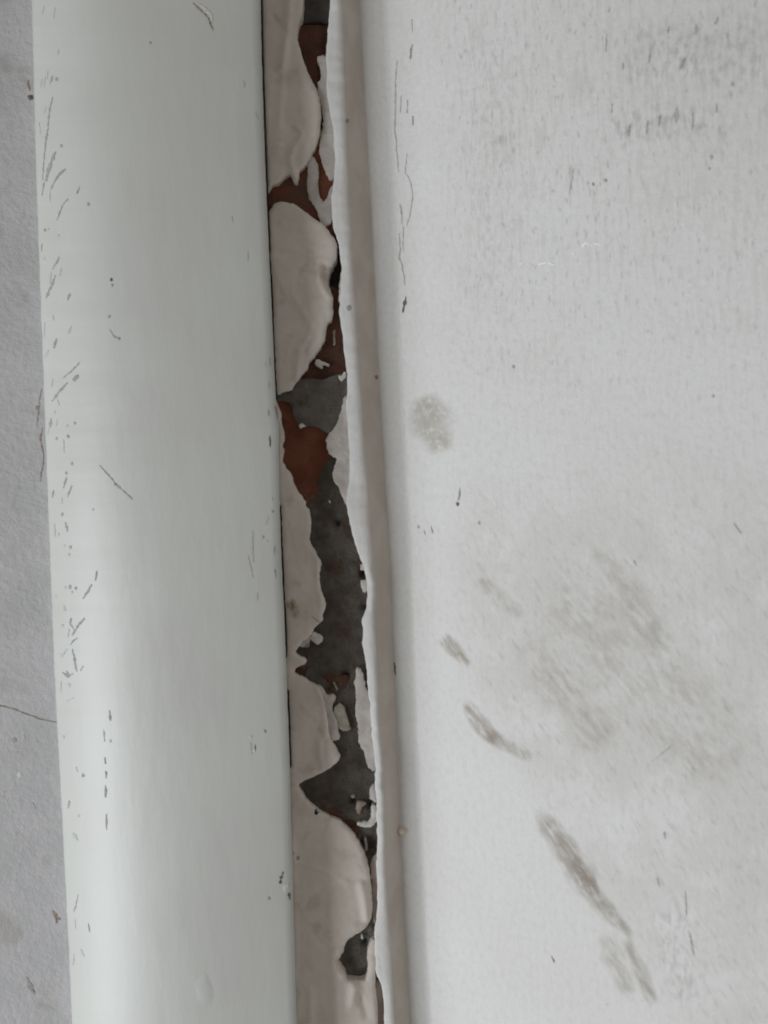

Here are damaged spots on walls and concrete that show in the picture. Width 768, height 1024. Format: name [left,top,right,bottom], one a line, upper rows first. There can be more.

flaking render [254,0,384,1024]